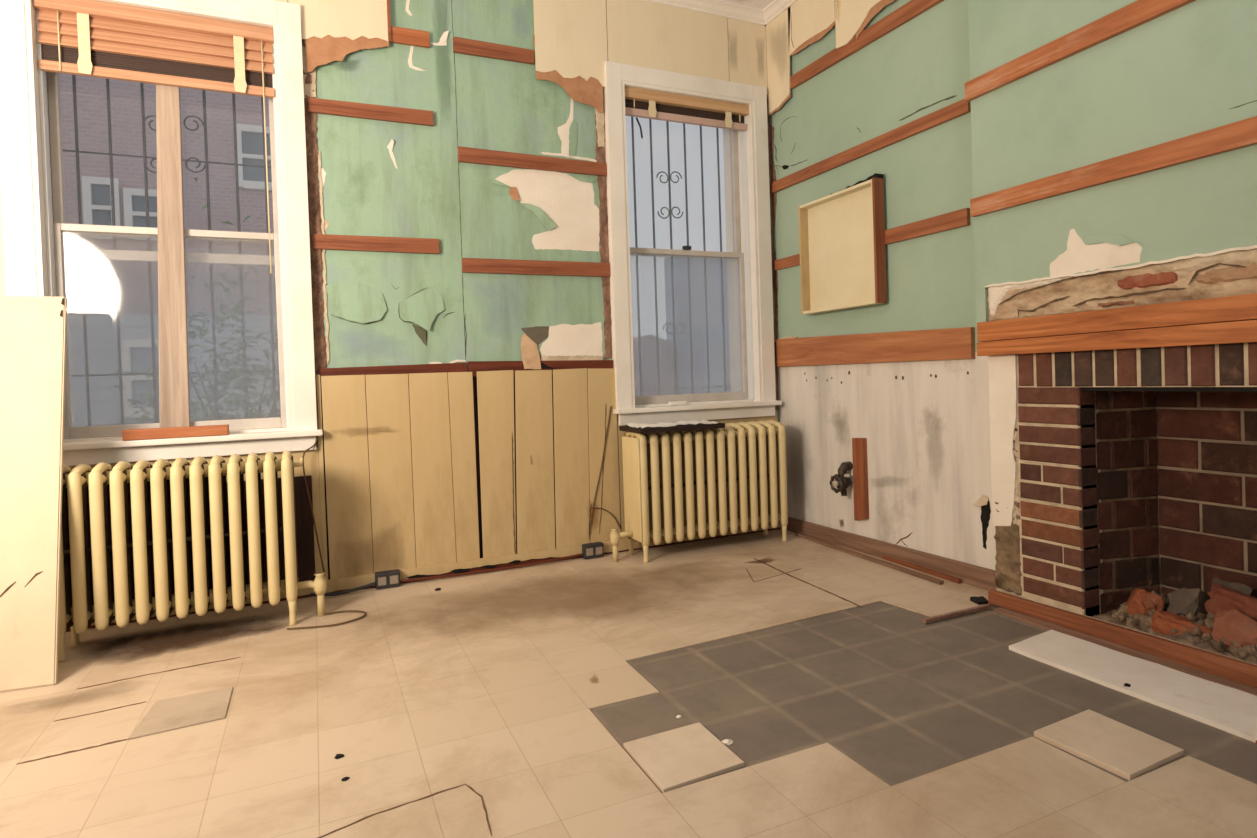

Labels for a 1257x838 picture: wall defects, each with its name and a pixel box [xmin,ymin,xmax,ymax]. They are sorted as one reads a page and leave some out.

peeling [408,46,425,71]
peeling [431,30,449,46]
spalling [301,27,329,374]
peeling [490,98,613,370]
spalling [985,229,1257,321]
crack [318,784,492,838]